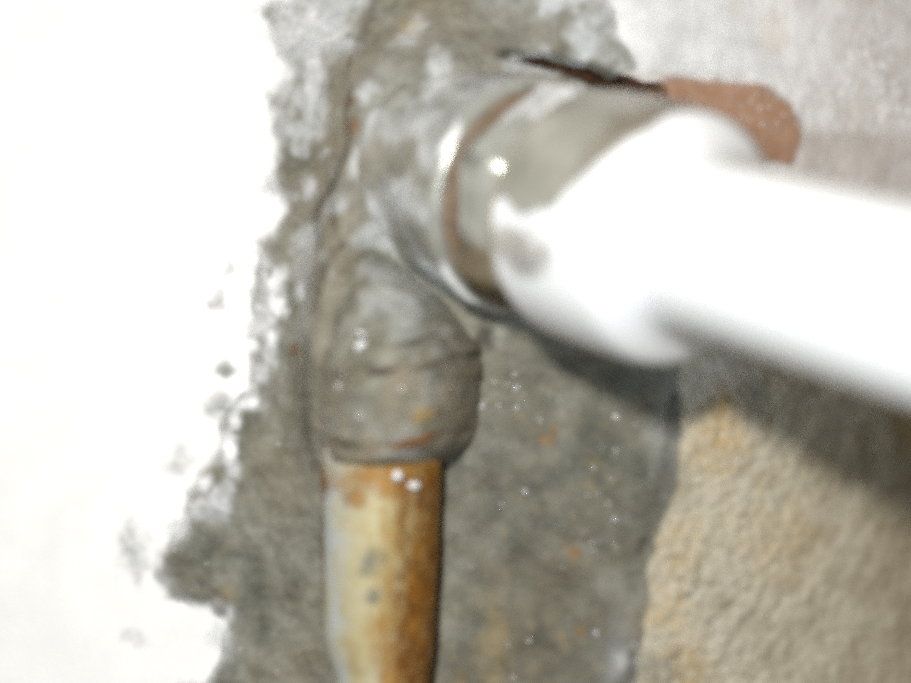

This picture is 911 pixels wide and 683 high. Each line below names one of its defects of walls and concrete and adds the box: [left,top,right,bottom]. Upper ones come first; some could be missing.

peeling [269,0,338,95]
peeling [249,251,289,382]
peeling [171,396,259,539]
corrosion [351,460,440,683]